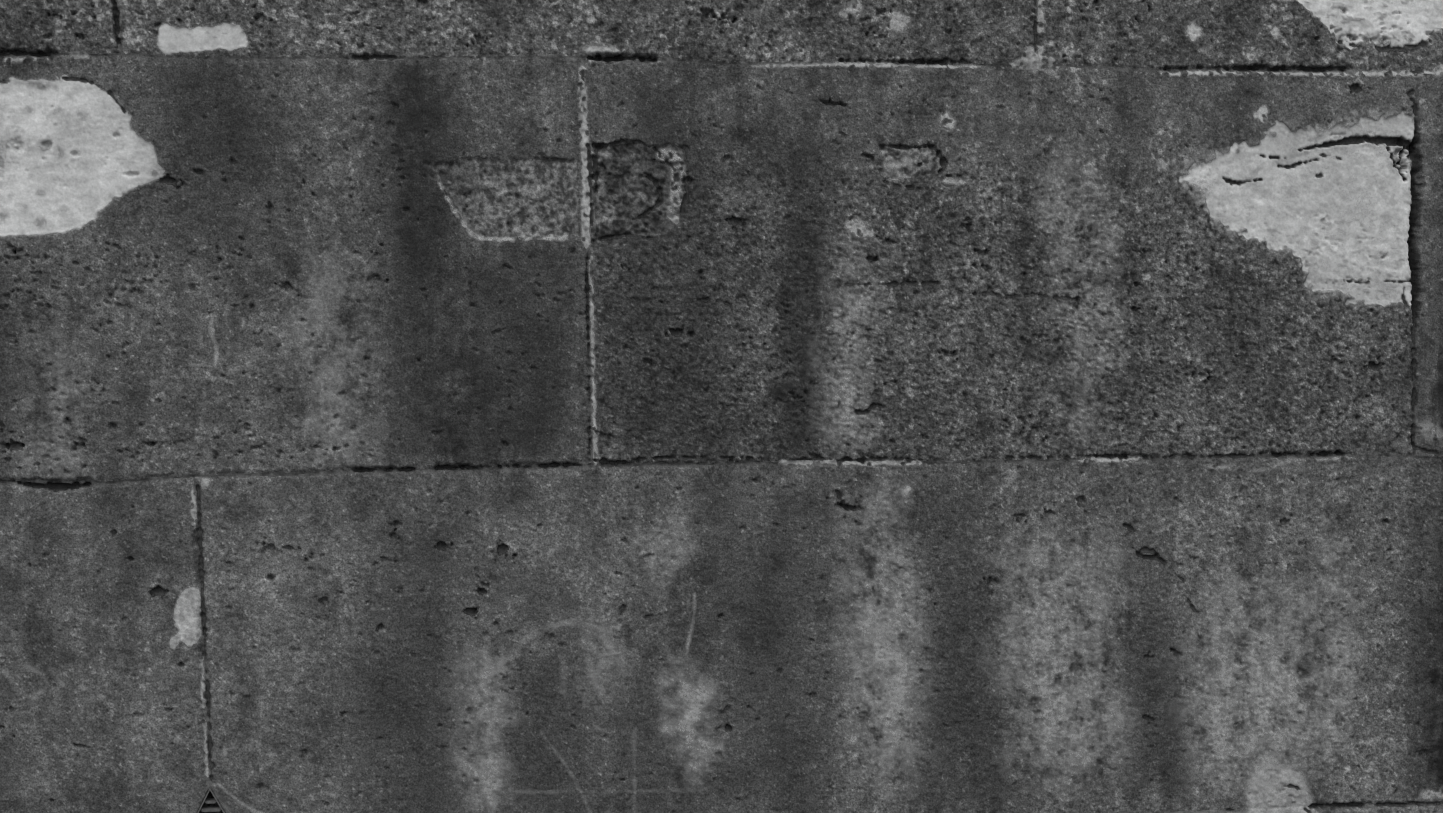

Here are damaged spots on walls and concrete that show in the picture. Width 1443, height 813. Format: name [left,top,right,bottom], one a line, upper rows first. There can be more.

spalling [422,139,691,247]
leakage [1423,722,1443,799]